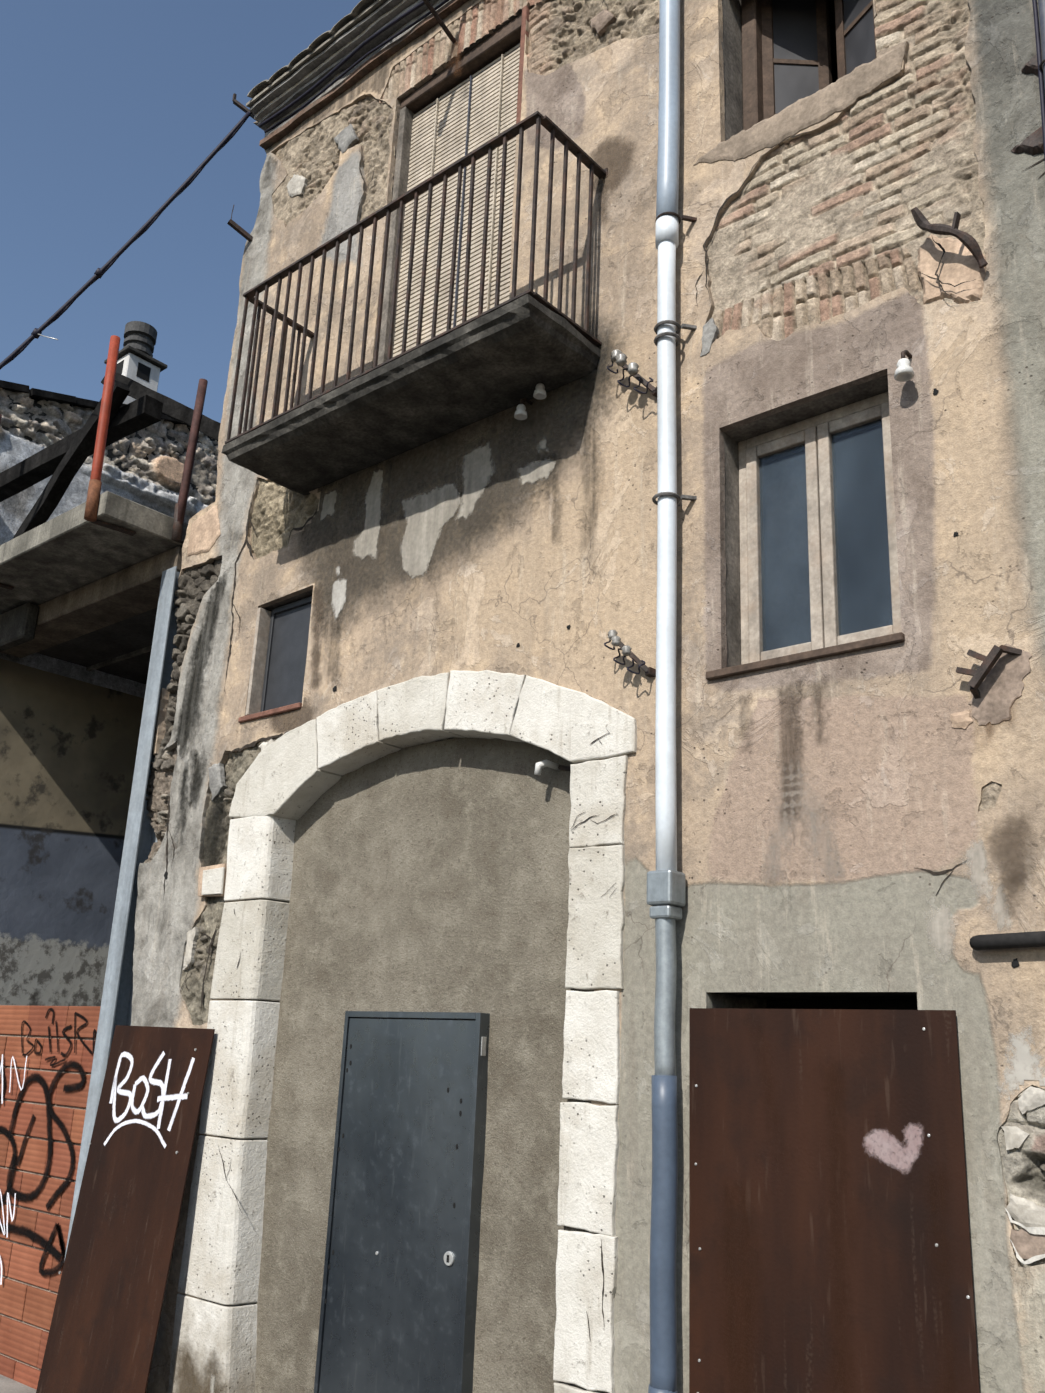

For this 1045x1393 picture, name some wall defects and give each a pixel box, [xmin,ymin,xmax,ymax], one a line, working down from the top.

spalling [272,0,659,225]
spalling [700,0,986,357]
spalling [246,479,337,559]
peeling [353,469,383,559]
peeling [401,443,495,578]
peeling [519,438,555,484]
spalling [204,731,289,865]
spalling [180,897,225,1025]
leakage [928,906,955,960]
leakage [967,819,1027,928]
spalling [997,1027,1045,1267]